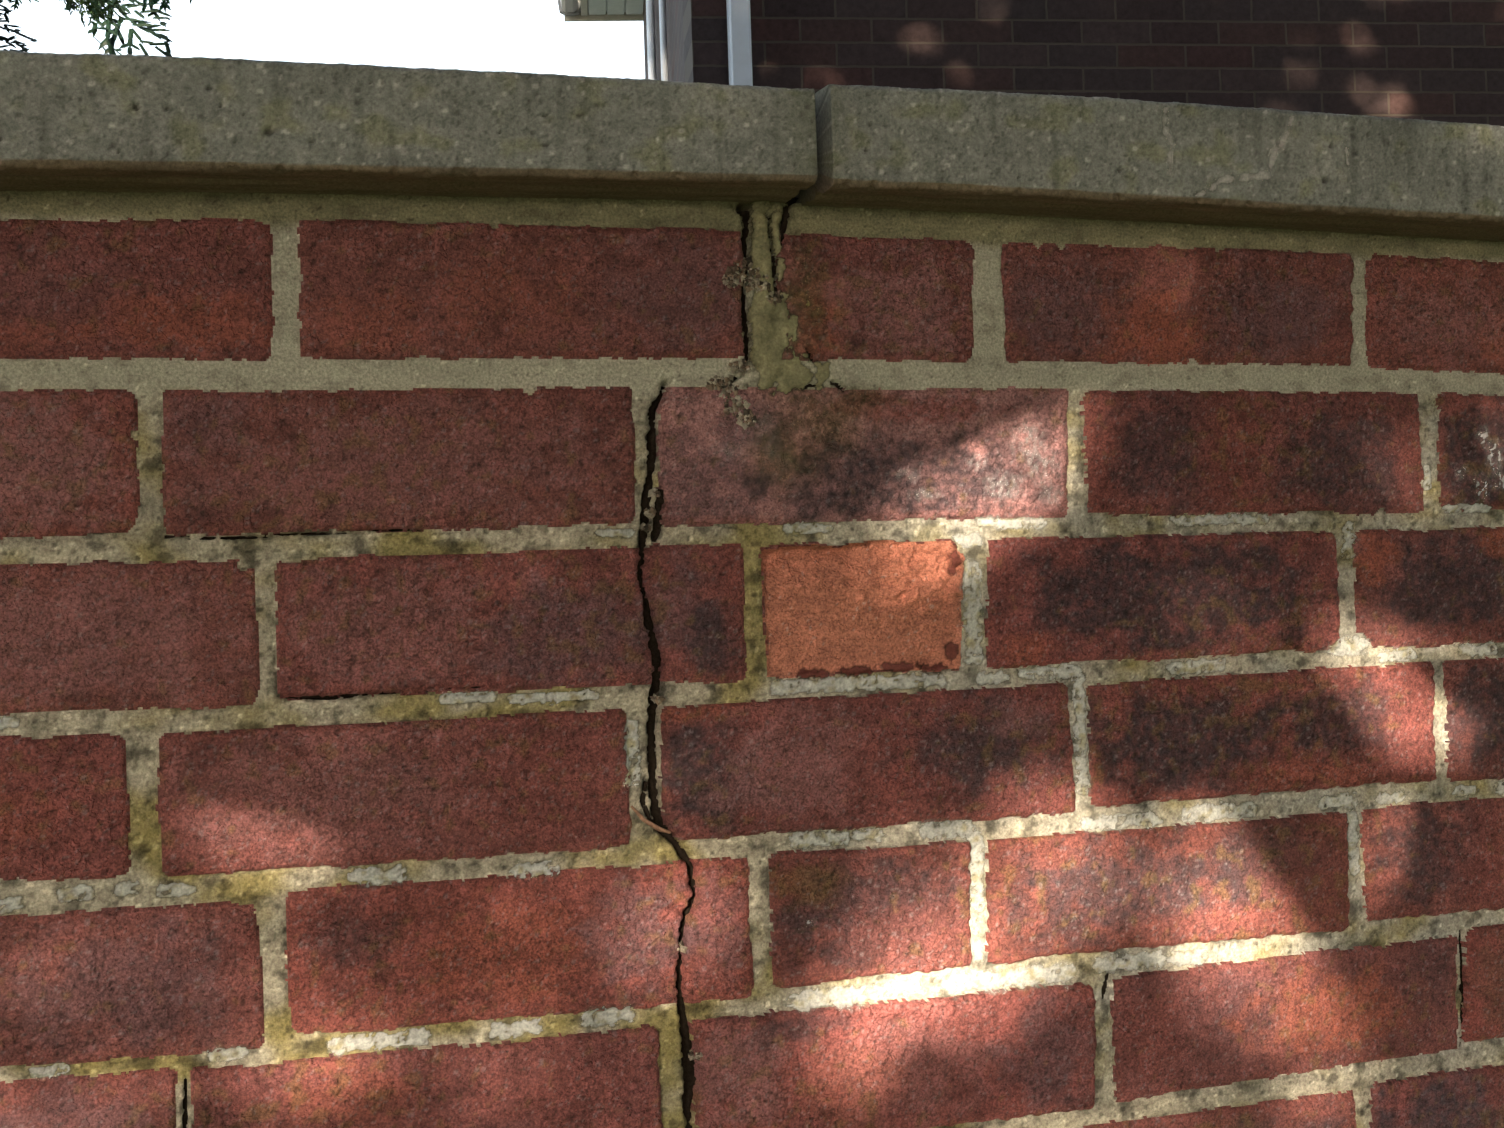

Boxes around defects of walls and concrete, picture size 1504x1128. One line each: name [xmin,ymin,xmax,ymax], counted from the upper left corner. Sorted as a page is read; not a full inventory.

crack [733,197,798,380]
crack [637,386,696,1128]